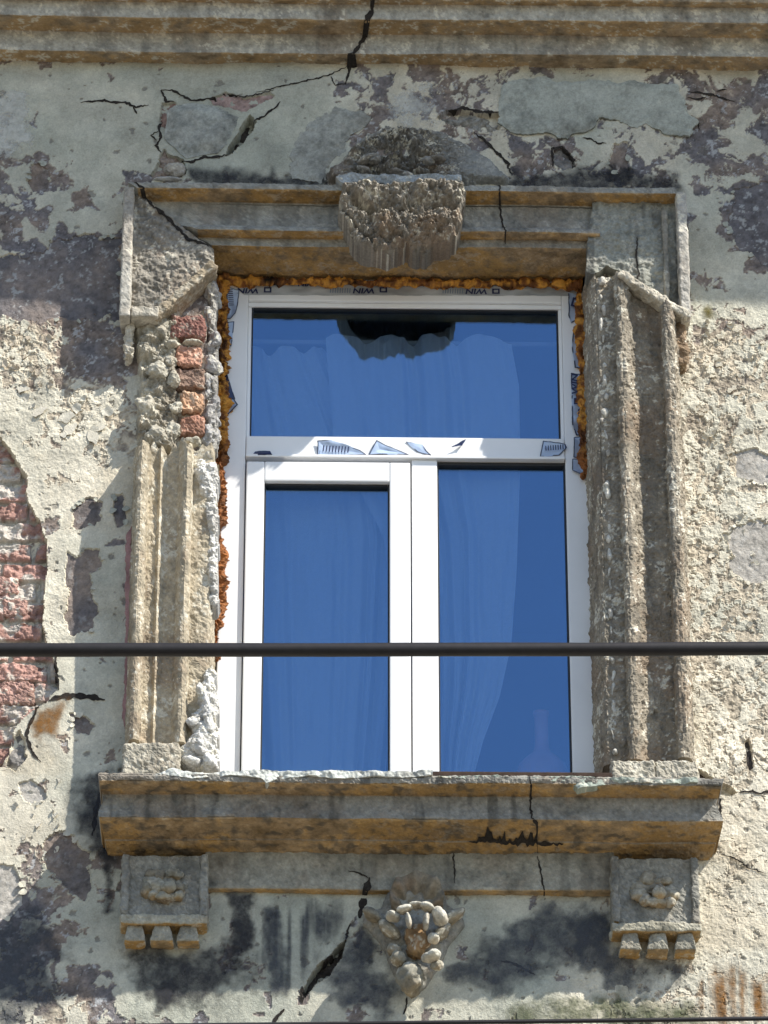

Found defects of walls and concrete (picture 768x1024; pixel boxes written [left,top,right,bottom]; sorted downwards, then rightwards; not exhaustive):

crack [81,0,375,163]
spalling [326,106,510,186]
crack [474,132,513,244]
peeling [0,234,122,347]
flaking render [0,440,47,643]
peeling [64,549,105,636]
flaking render [0,657,105,770]
crack [452,776,563,896]
water stain [0,910,58,1024]
water stain [156,984,173,1011]
crack [272,871,371,1022]
water stain [446,904,683,997]